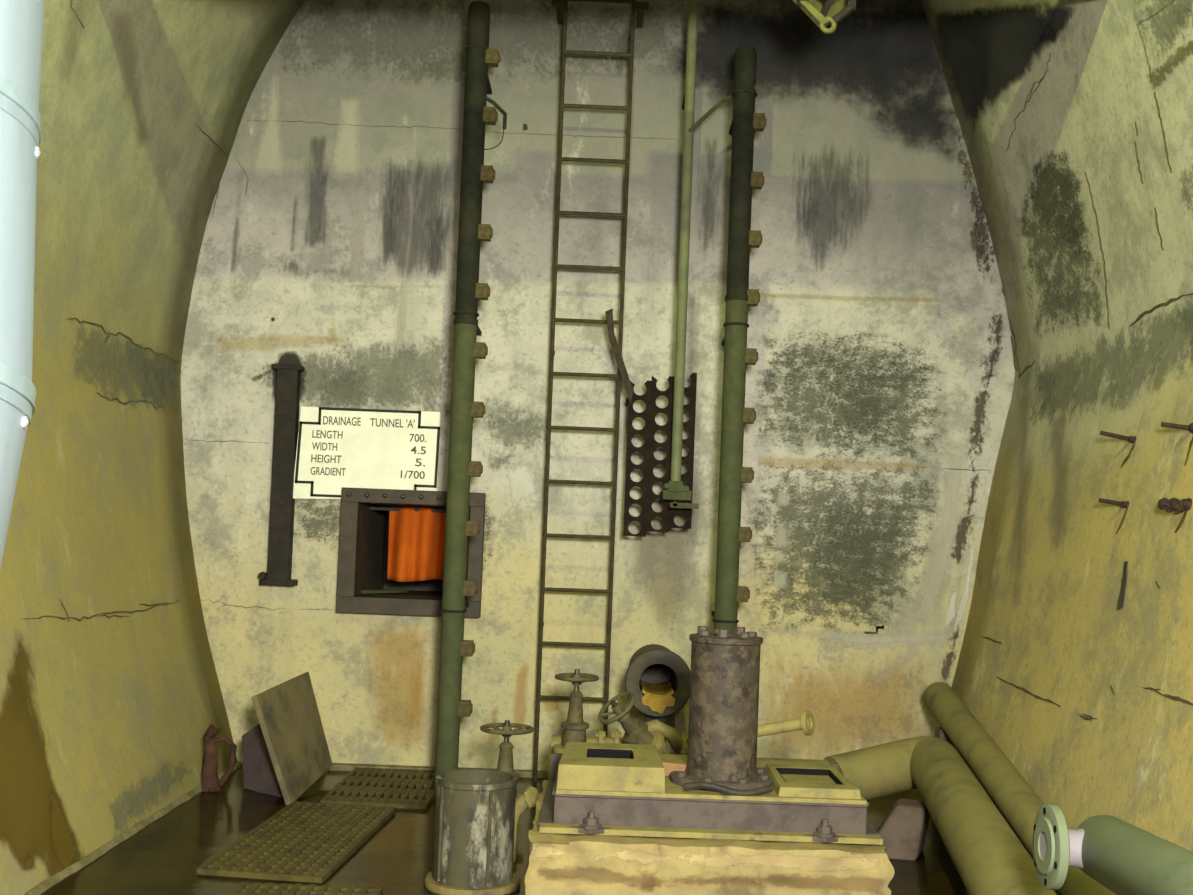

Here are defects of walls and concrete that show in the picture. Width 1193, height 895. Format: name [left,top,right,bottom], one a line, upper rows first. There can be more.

damp [804,161,862,260]
mould [1019,153,1104,333]
crack [1085,172,1193,329]
mould [1032,302,1193,423]
damp [753,334,962,655]
corrosion [1158,497,1188,533]
crack [22,594,331,622]
damp [0,641,80,877]
crack [997,677,1097,720]
crack [1142,687,1193,705]